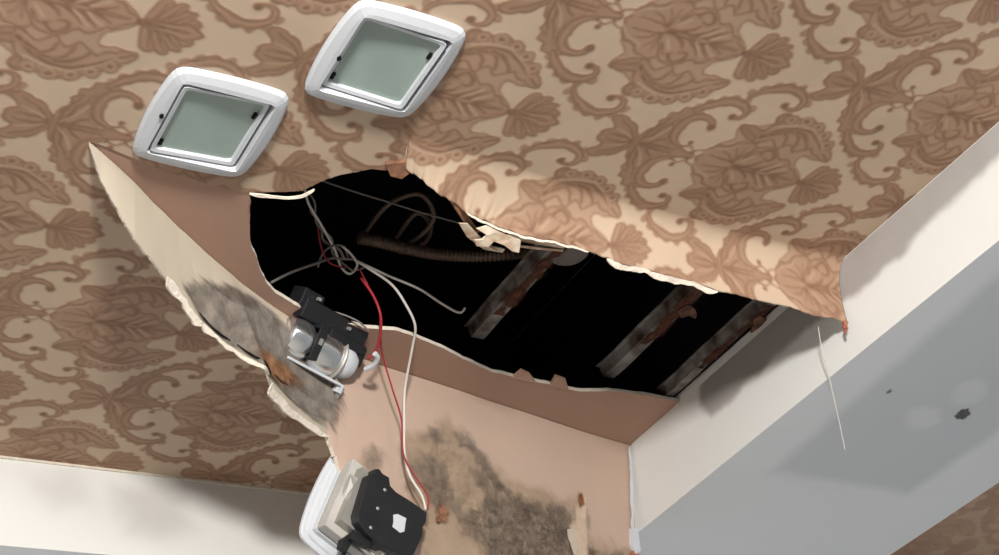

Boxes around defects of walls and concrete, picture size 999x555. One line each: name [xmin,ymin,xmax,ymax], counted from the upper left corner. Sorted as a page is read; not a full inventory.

peeling [385,159,410,179]
peeling [88,142,329,437]
water stain [185,279,342,429]
peeling [512,368,536,383]
corrosion [494,247,567,316]
peeling [550,374,568,389]
corrosion [641,286,709,344]
corrosion [687,305,776,382]
water stain [405,426,631,555]
corrosion [629,528,641,555]